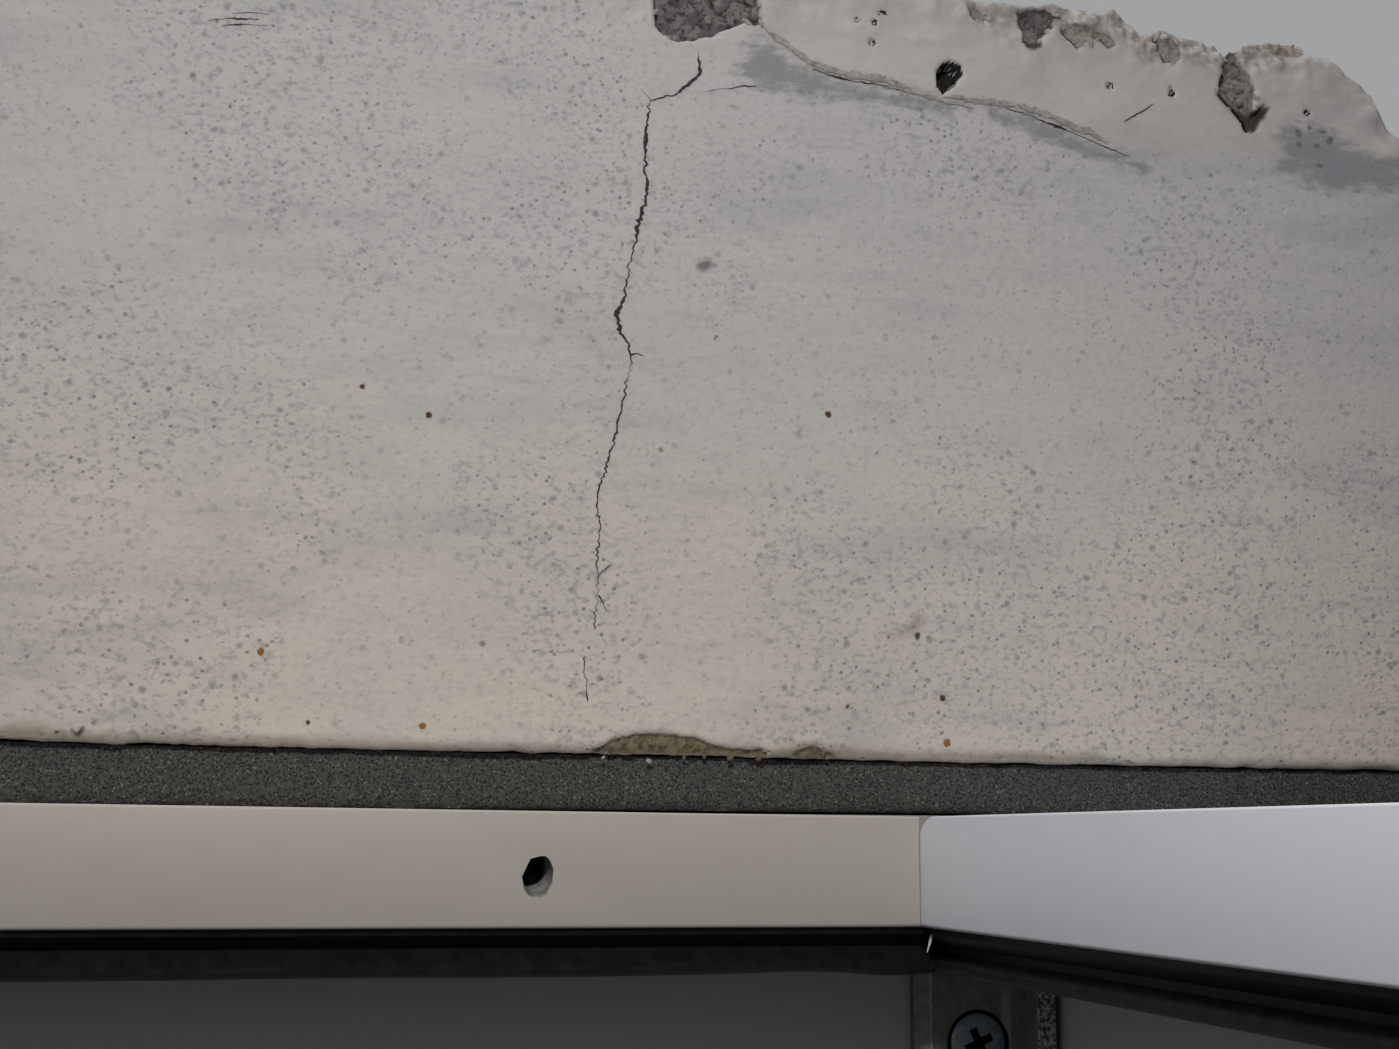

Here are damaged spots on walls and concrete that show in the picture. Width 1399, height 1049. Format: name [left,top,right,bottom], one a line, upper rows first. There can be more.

spalling [653,0,1129,157]
spalling [1153,31,1180,65]
spalling [1214,42,1303,133]
crack [583,53,757,701]